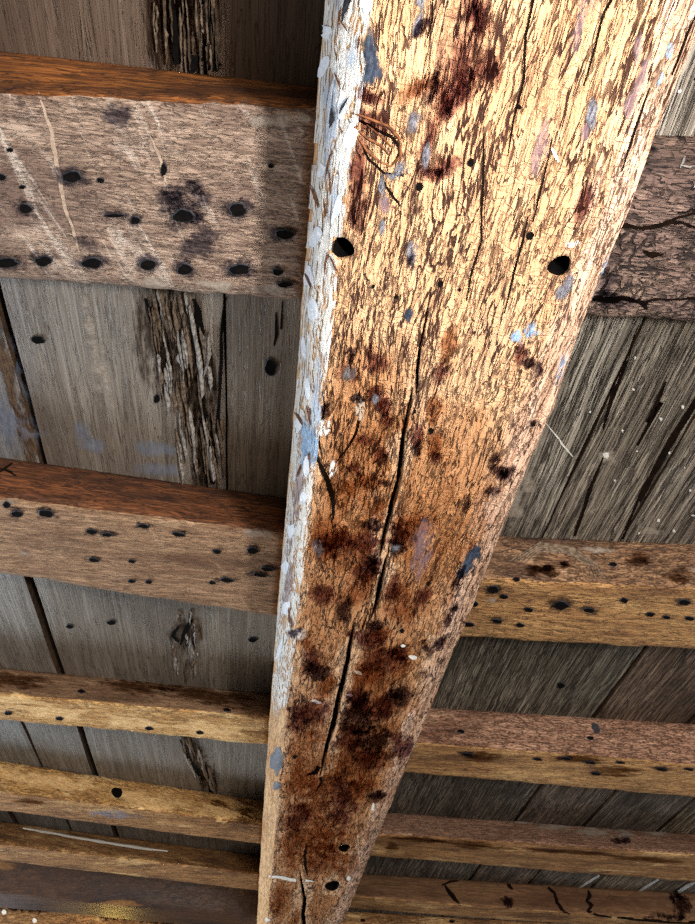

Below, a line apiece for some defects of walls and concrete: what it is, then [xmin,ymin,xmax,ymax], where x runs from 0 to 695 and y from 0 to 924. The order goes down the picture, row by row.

leakage [419,0,501,181]
leakage [368,386,393,426]
leakage [411,427,441,462]
leakage [311,518,410,584]
crack [306,293,430,790]
leakage [450,546,482,591]
leakage [310,586,409,675]
leakage [419,605,461,655]
leakage [288,686,414,771]
crack [300,845,308,924]
crack [442,880,460,906]
crack [548,887,695,924]